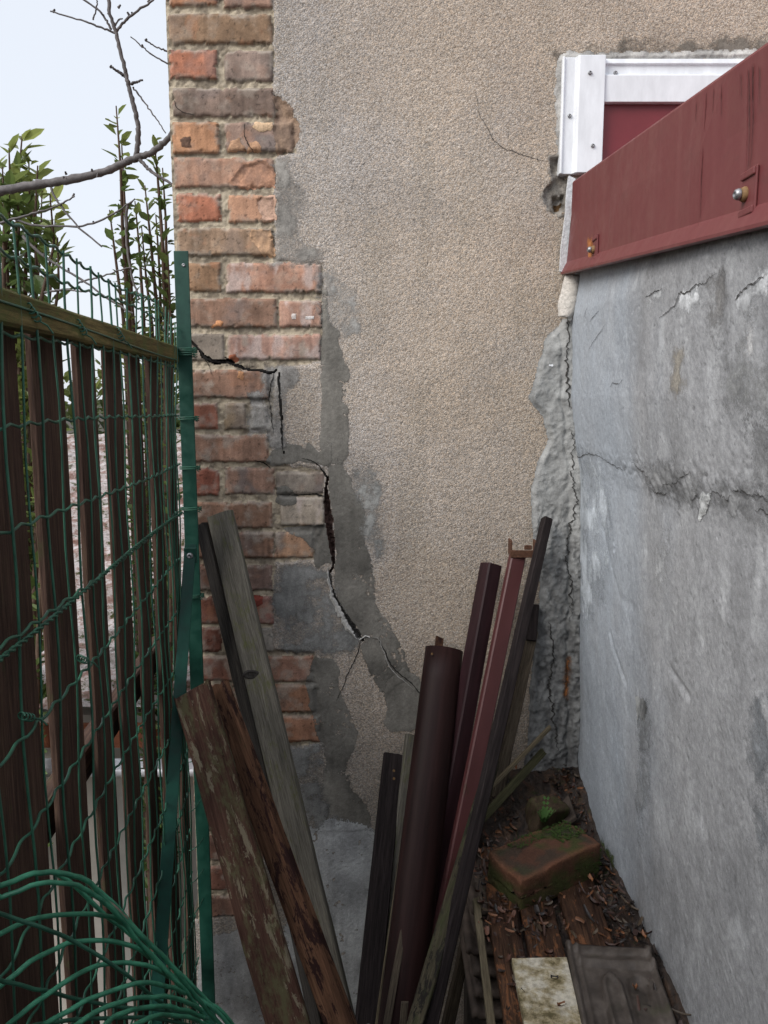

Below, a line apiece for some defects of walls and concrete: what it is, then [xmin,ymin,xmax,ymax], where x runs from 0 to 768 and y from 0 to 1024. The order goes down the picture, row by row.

crack [474,88,544,161]
spalling [227,96,302,258]
spalling [541,154,567,217]
peeling [558,274,579,319]
crack [645,274,715,318]
crack [192,343,420,701]